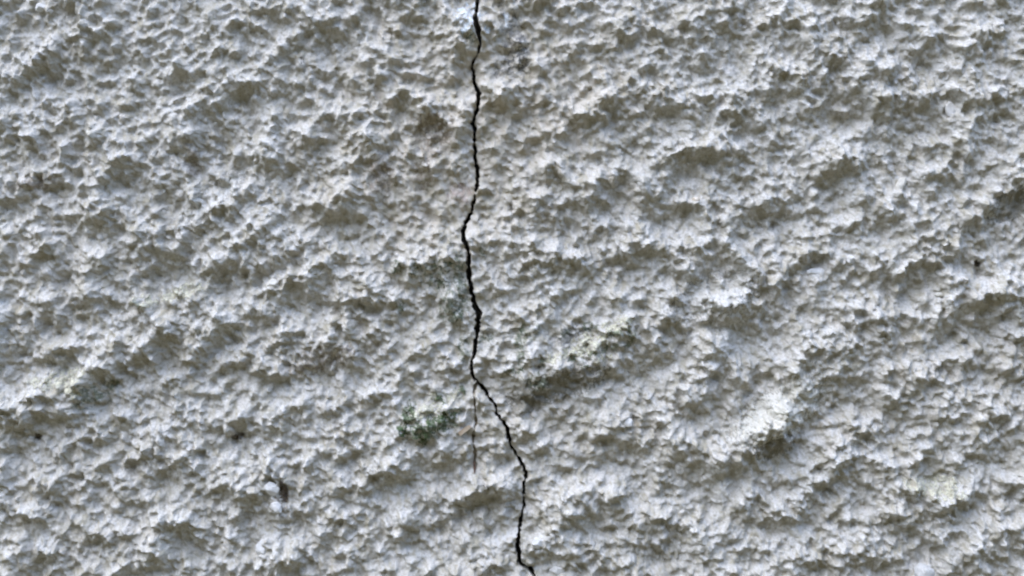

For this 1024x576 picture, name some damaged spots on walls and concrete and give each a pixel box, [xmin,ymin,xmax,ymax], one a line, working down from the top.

crack [461,0,536,576]